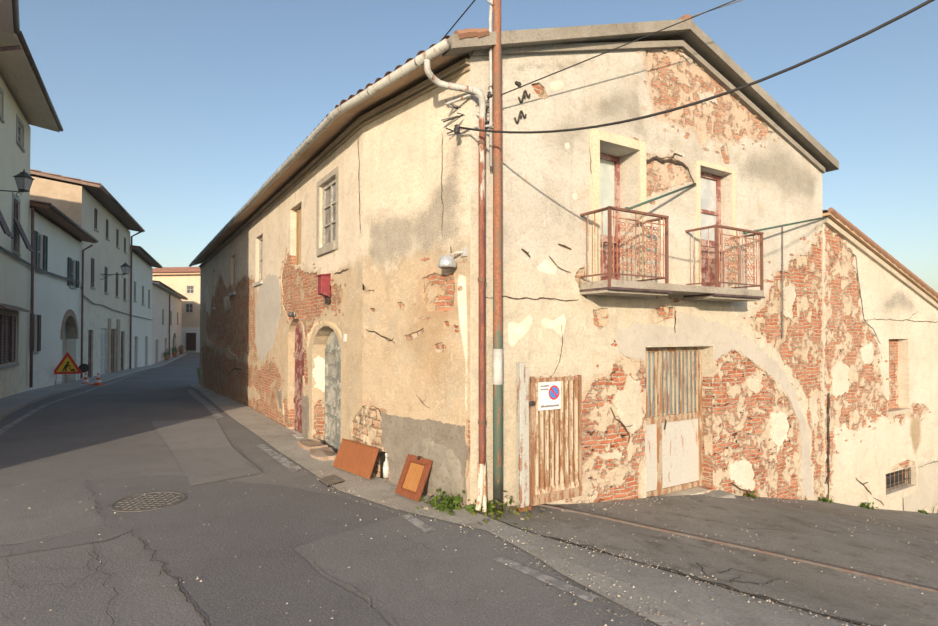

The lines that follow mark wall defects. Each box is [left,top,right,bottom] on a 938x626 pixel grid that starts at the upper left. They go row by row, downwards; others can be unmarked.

flaking render [636,48,782,164]
flaking render [646,149,697,205]
flaking render [200,271,295,428]
flaking render [280,245,346,445]
flaking render [399,252,469,340]
crack [485,294,575,302]
crack [521,243,571,272]
flaking render [697,226,931,501]
flaking render [352,398,390,480]
flaking render [564,340,646,504]
crack [6,480,119,624]
crack [132,530,207,626]